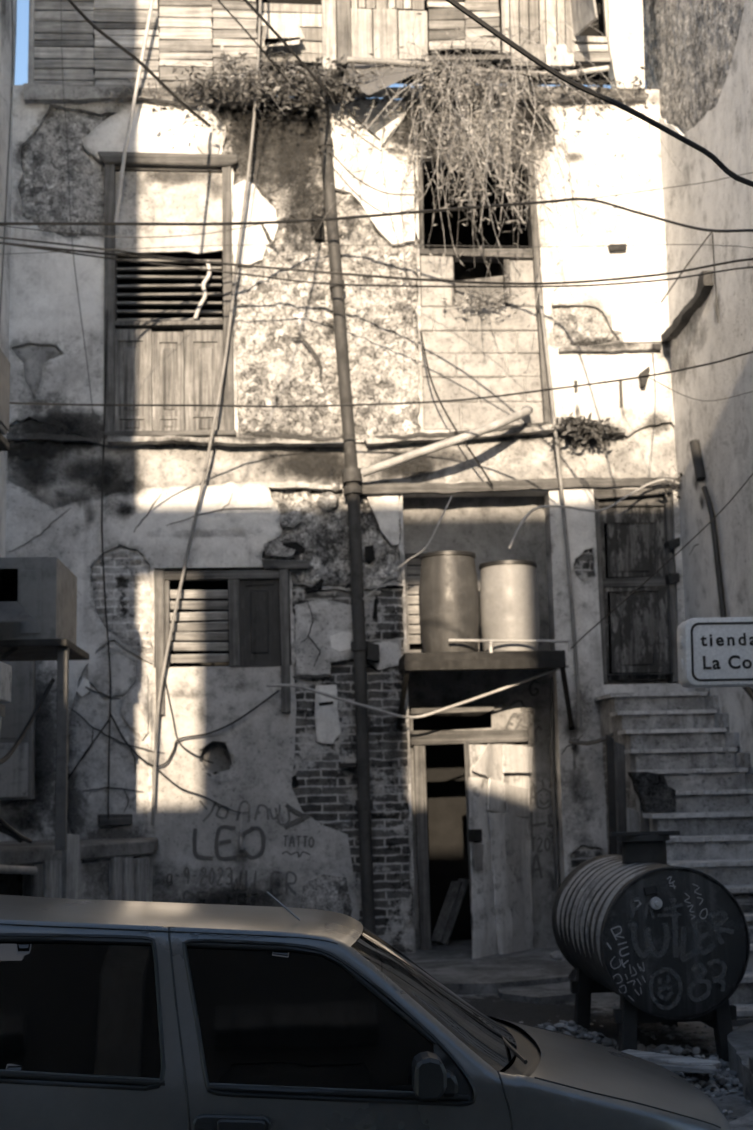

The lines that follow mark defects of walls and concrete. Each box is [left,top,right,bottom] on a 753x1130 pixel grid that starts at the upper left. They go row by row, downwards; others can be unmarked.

crack [10,508,70,552]
water stain [20,413,135,515]
crack [134,492,272,532]
flaking render [7,96,677,954]
crack [69,686,163,812]